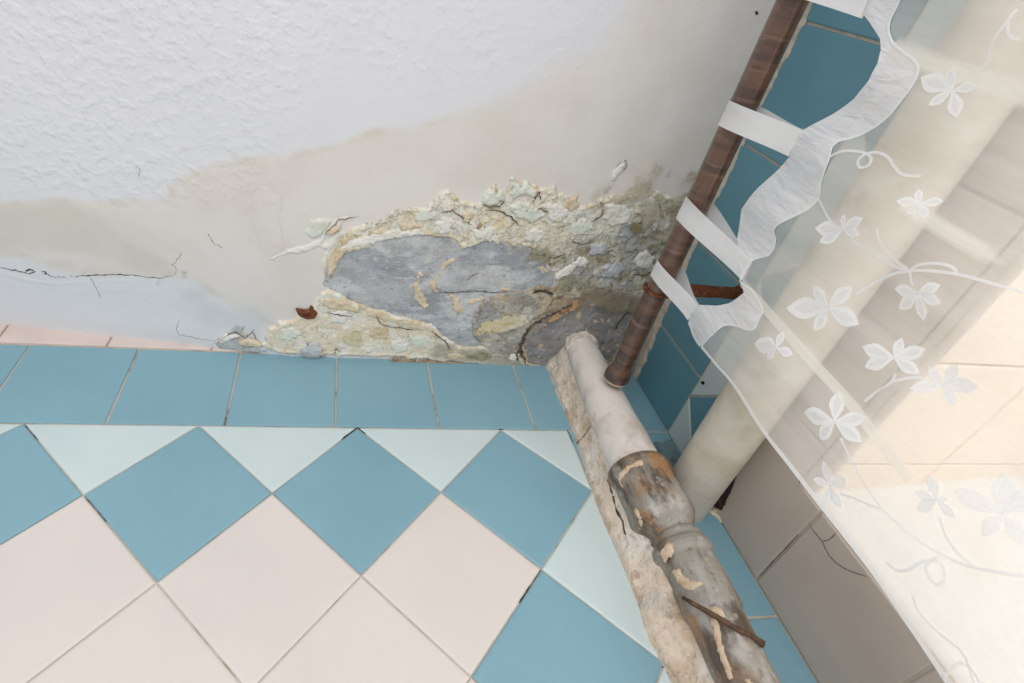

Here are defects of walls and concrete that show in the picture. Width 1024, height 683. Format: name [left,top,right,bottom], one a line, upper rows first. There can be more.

water stain [0,0,775,353]
crack [0,253,182,298]
rust [295,305,318,319]
flaking render [214,160,682,366]
crack [516,289,572,366]
crack [760,526,868,577]